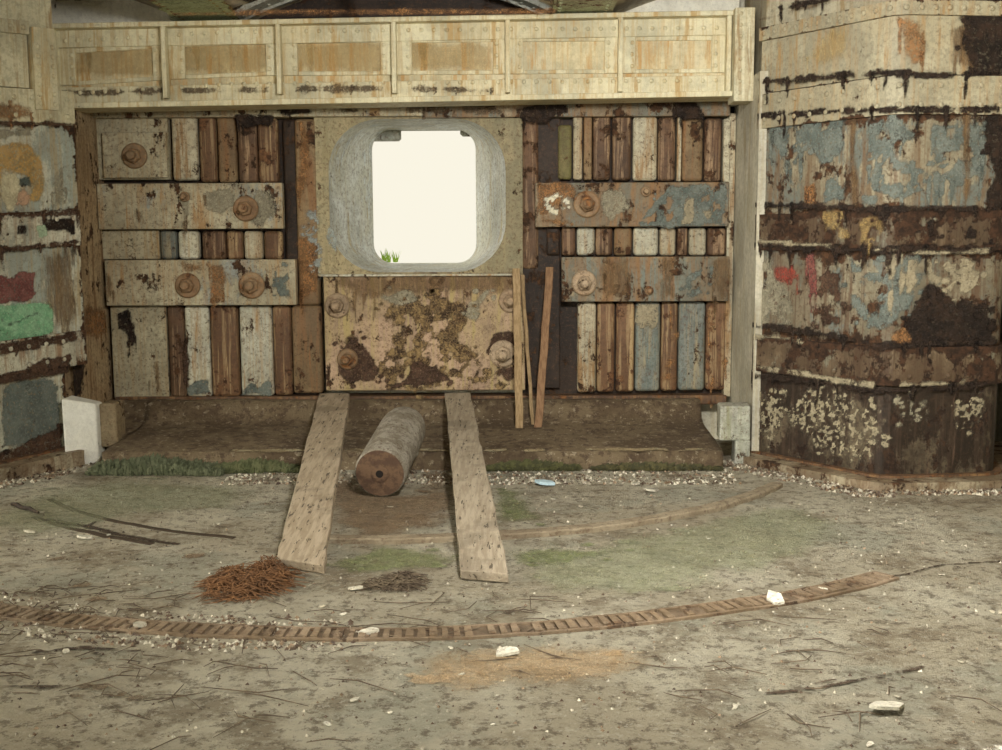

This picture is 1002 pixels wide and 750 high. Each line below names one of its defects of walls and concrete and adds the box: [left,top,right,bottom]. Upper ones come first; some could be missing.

rust [0,100,77,130]
peeling [544,194,570,215]
peeling [638,183,728,229]
peeling [768,120,844,183]
rust [752,16,1002,364]
peeling [861,115,987,211]
rust [0,209,80,269]
rust [0,307,137,396]
rust [486,330,524,385]
rust [0,423,63,461]
peeling [756,366,965,462]
peeling [955,397,984,435]